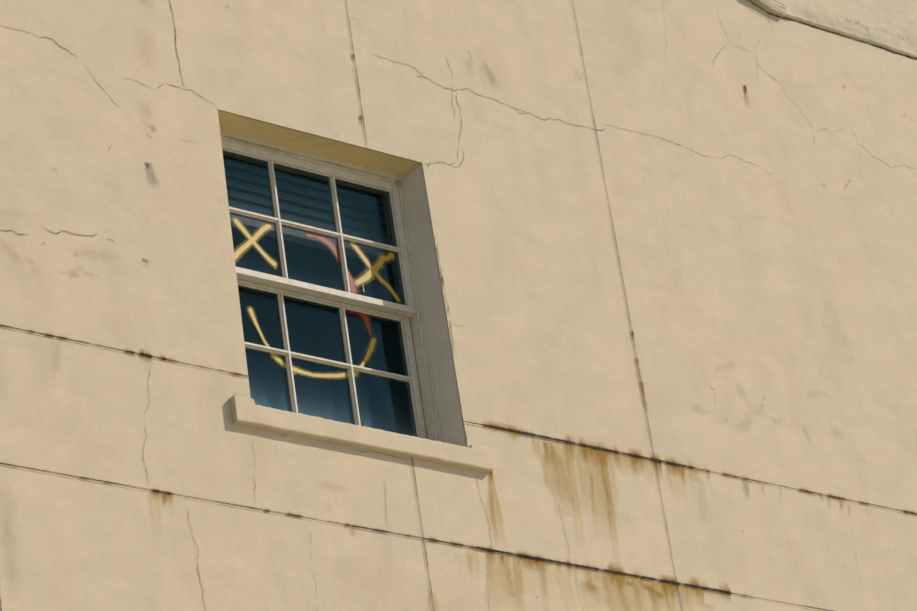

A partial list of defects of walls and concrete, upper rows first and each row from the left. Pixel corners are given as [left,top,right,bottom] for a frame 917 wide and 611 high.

crack [141,0,203,98]
crack [416,61,602,167]
corrosion [564,438,694,474]
corrosion [518,553,708,596]